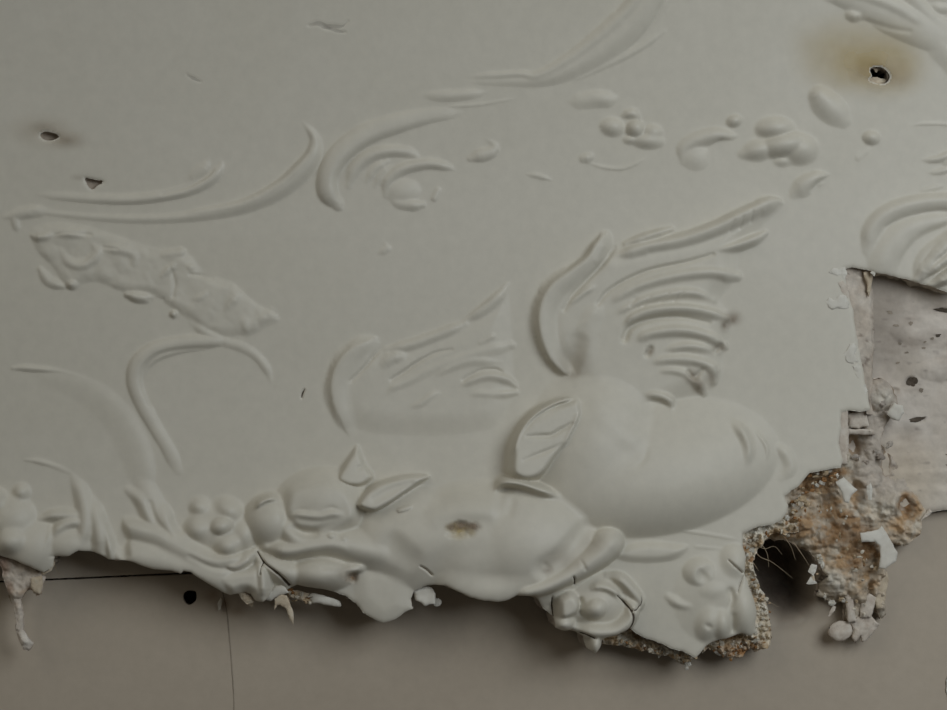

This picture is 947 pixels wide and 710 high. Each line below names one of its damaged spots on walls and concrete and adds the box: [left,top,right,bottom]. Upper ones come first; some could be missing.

spalling [40,132,58,141]
spalling [85,178,103,189]
spalling [753,268,947,643]
spalling [449,522,477,532]
crack [257,551,291,586]
spalling [31,575,43,594]
spalling [184,591,197,605]
crack [617,595,642,630]